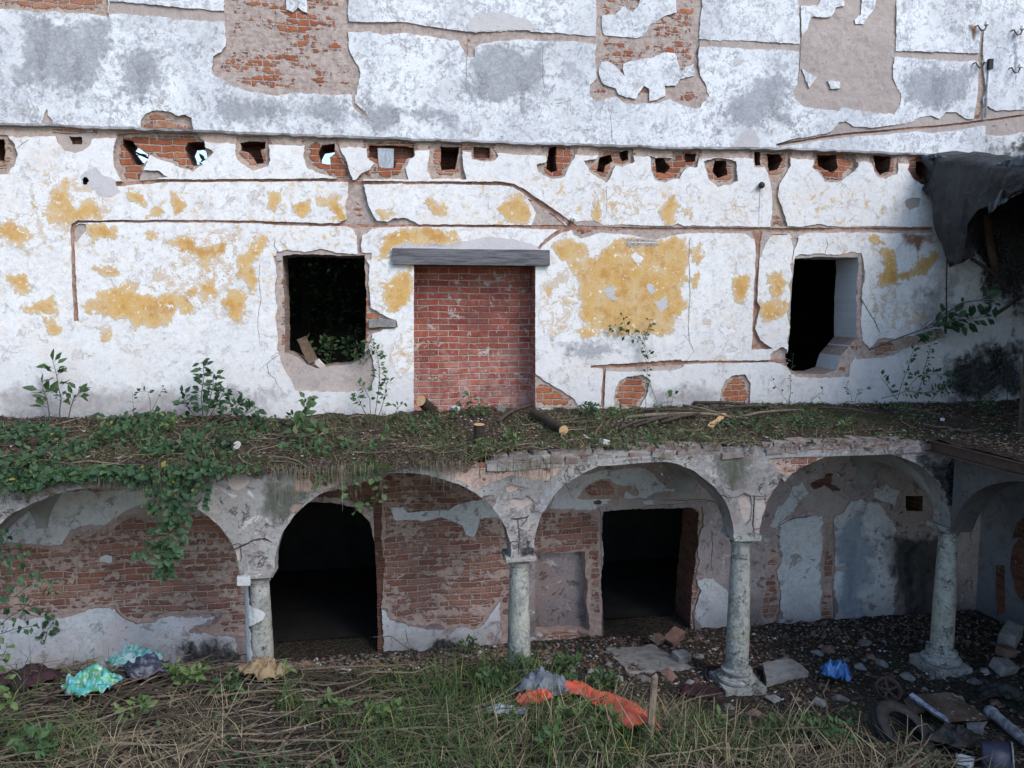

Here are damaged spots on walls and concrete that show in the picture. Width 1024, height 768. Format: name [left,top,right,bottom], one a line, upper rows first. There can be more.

leakage [467,43,548,113]
spalling [0,0,1024,409]
spalling [0,510,249,637]
spalling [290,459,581,652]
spalling [760,544,800,624]
spalling [802,473,850,619]
spalling [737,444,926,533]